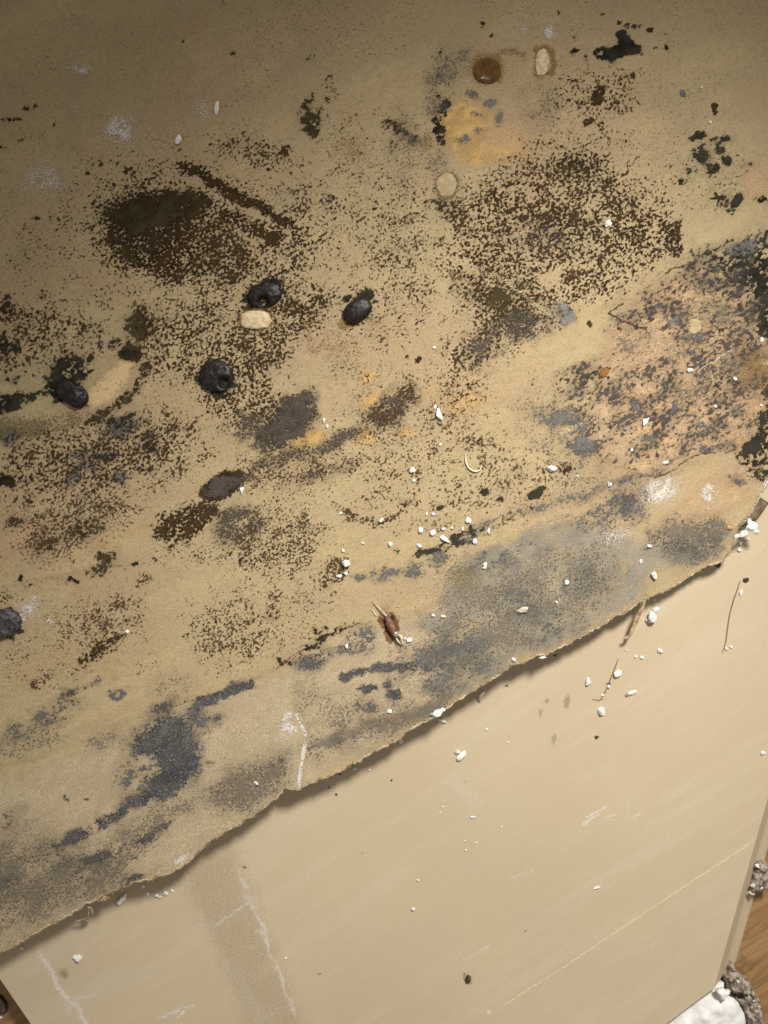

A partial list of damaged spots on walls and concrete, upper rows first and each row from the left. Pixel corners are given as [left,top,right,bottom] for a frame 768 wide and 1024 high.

leakage [593,20,644,67]
leakage [0,43,768,760]
peeling [727,518,760,538]
leakage [0,675,296,937]
peeling [0,603,447,949]